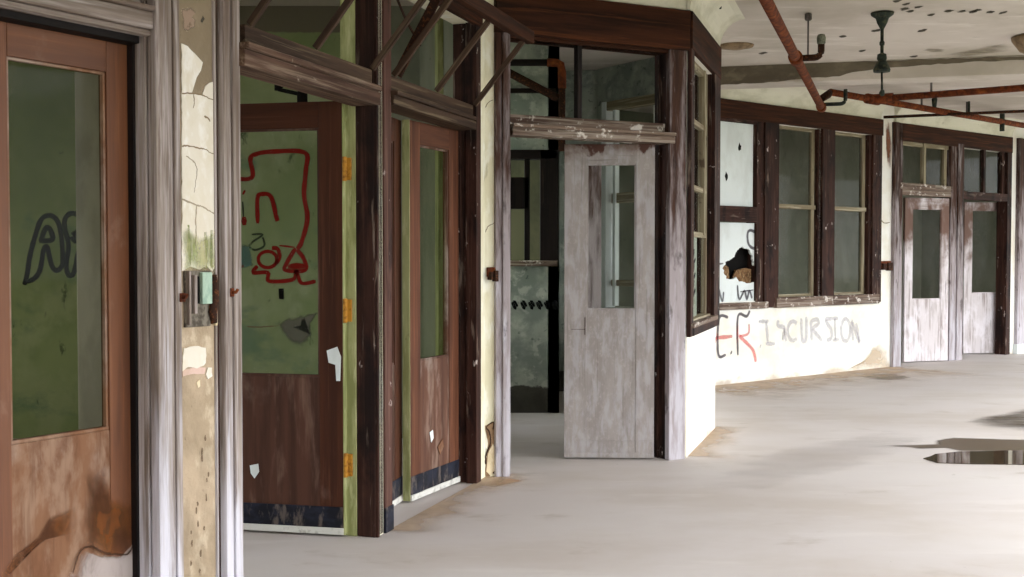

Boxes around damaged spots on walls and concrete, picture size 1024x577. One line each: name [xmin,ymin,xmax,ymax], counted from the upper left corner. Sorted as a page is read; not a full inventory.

crack [182,92,213,121]
peeling [181,43,214,271]
crack [182,145,214,244]
leakage [186,225,213,268]
peeling [182,346,212,388]
leakage [857,350,907,379]